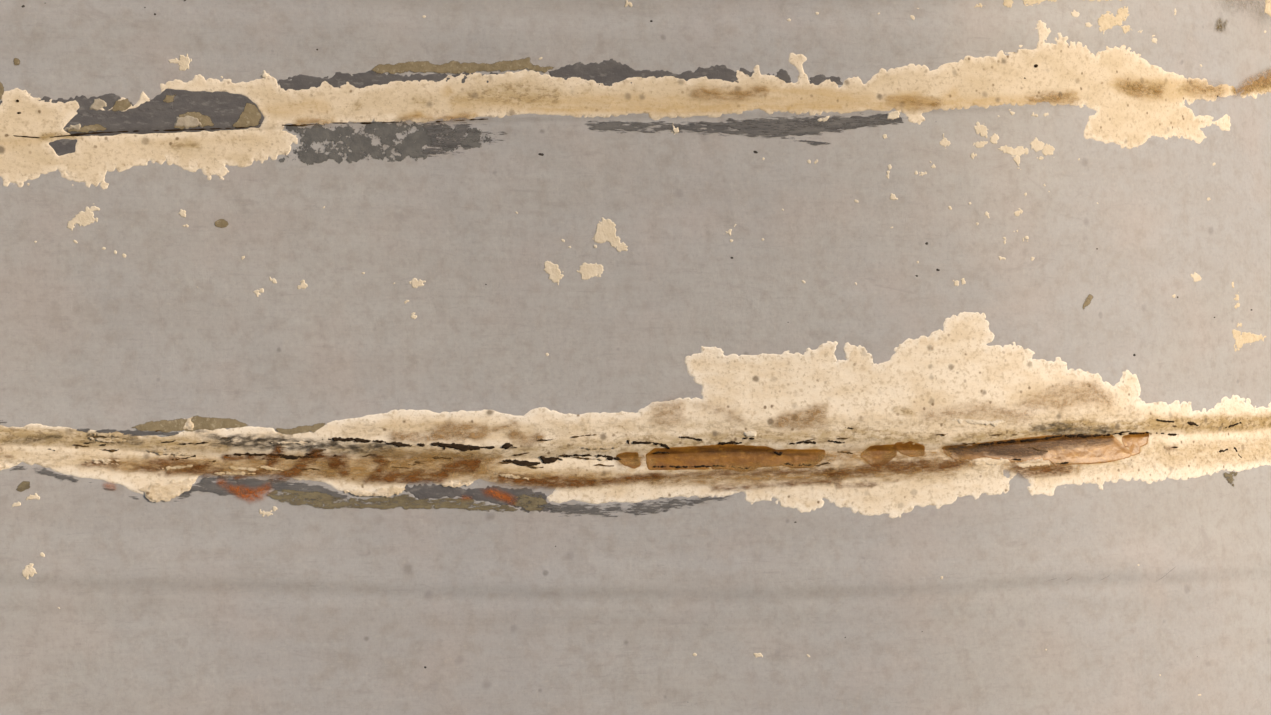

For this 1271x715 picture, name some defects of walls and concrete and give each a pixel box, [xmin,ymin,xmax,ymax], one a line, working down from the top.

peeling [0,0,1271,189]
peeling [67,203,100,244]
peeling [592,217,628,252]
peeling [543,261,604,285]
peeling [1232,282,1266,352]
peeling [0,312,1271,523]
crack [50,436,119,452]
crack [155,427,854,470]
rust [85,437,1112,501]
crack [936,419,1242,465]